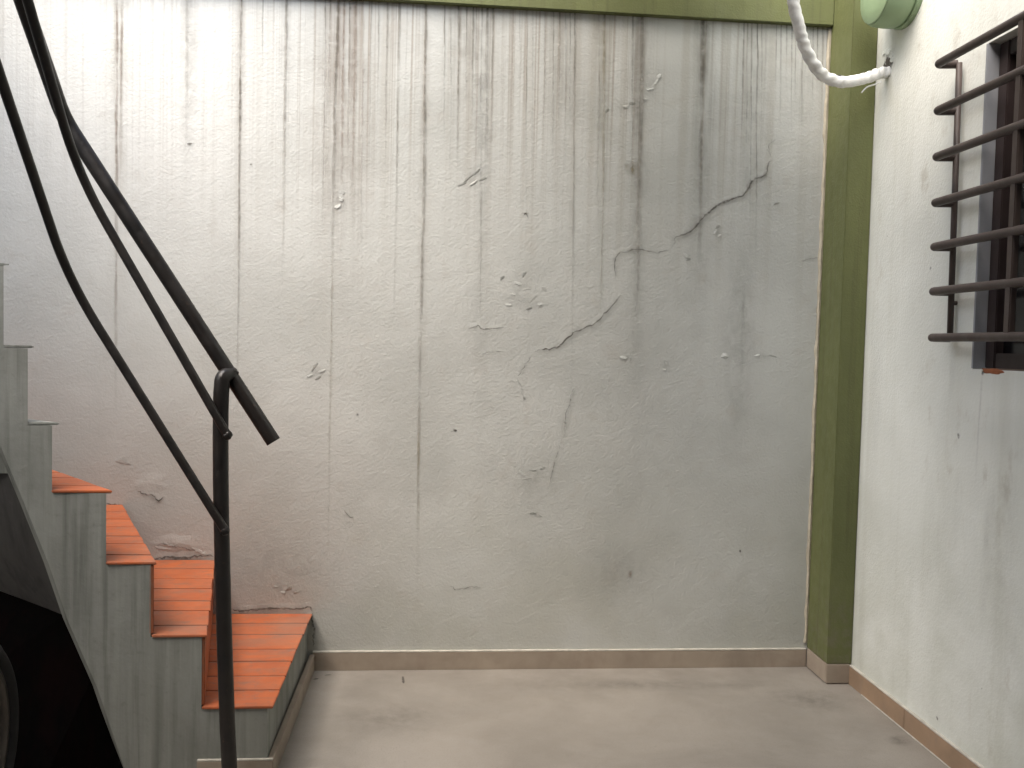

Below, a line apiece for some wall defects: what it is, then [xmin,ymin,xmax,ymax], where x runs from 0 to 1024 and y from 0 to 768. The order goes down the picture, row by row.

crack [532,158,770,352]